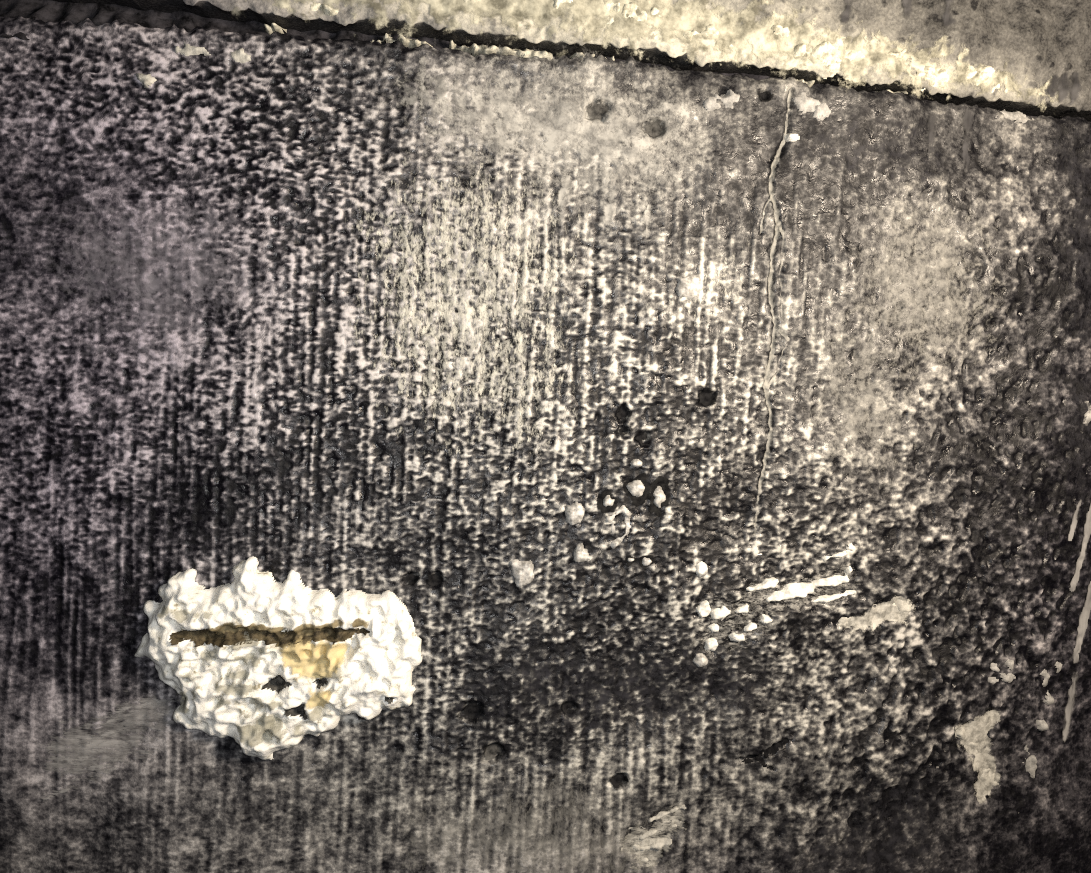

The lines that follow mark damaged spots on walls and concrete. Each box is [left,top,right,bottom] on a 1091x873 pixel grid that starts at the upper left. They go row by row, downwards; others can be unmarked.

crack [754,89,800,535]